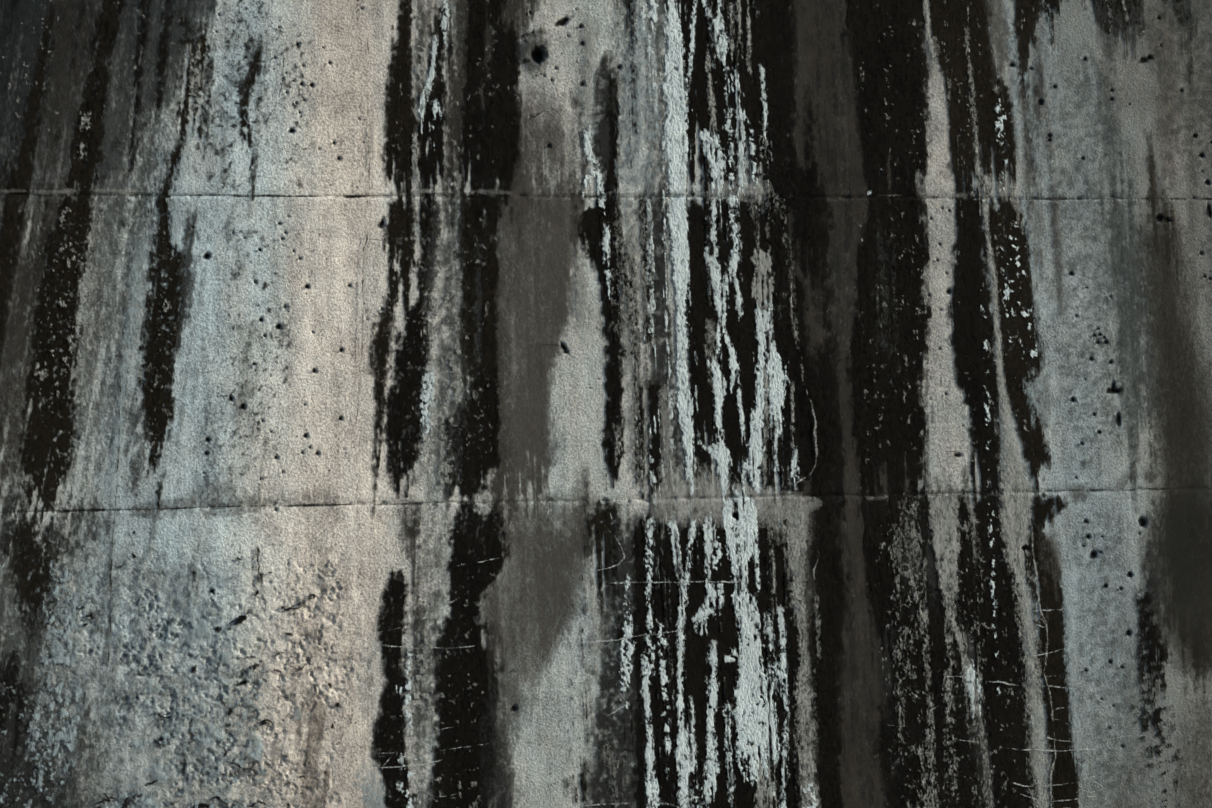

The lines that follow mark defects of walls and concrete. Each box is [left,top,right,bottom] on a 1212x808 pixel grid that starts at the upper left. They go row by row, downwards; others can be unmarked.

water stain [282,34,311,163]
water stain [1084,0,1145,58]
water stain [0,0,268,758]
water stain [220,301,282,447]
water stain [357,0,1086,808]
water stain [1100,138,1212,808]
water stain [64,693,122,771]